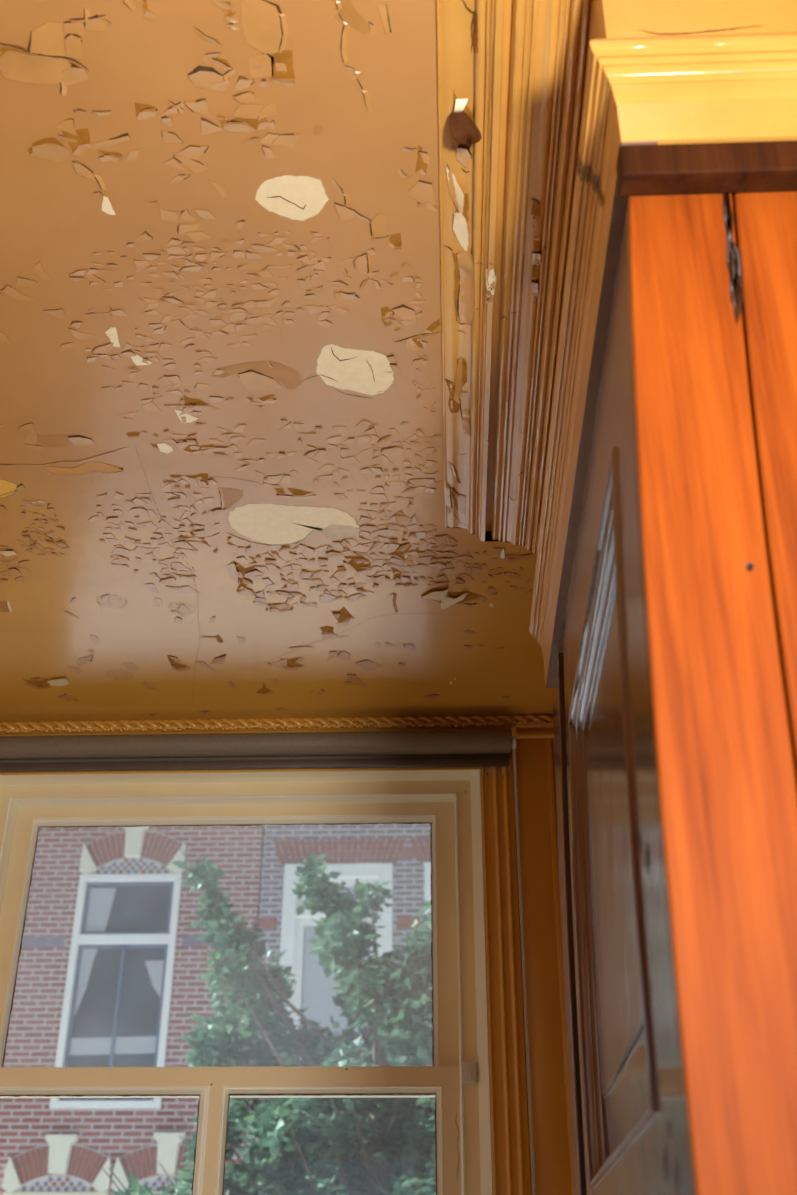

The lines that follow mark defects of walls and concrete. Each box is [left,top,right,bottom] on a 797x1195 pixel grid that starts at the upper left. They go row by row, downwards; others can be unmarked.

peeling [0,22,89,96]
peeling [134,0,300,197]
peeling [333,0,392,112]
peeling [462,0,478,53]
peeling [27,108,140,215]
peeling [397,89,497,334]
peeling [22,635,100,702]
peeling [256,657,304,695]